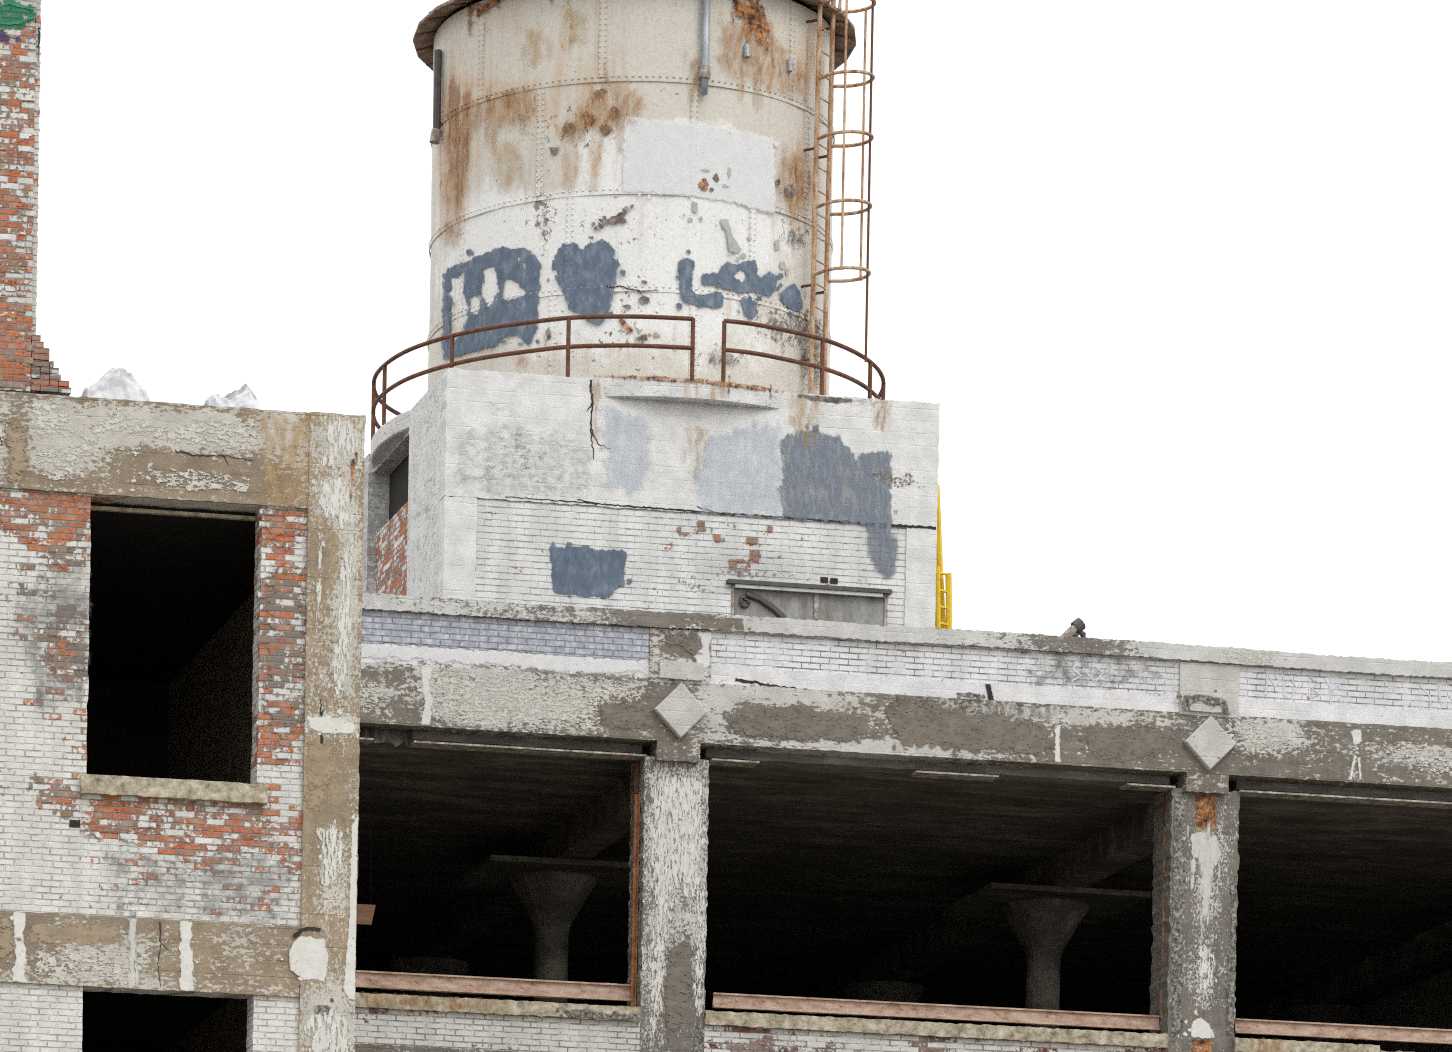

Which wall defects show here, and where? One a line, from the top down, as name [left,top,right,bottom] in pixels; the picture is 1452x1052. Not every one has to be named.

corrosion [467,0,500,36]
corrosion [718,0,807,103]
corrosion [549,75,641,181]
corrosion [775,156,805,209]
flaking render [0,25,261,570]
crack [587,379,607,459]
crack [505,496,936,530]
flaking render [0,772,280,865]
peeling [0,912,142,988]
peeling [179,921,198,991]
peeling [556,767,706,1052]
spalling [1170,792,1237,1041]